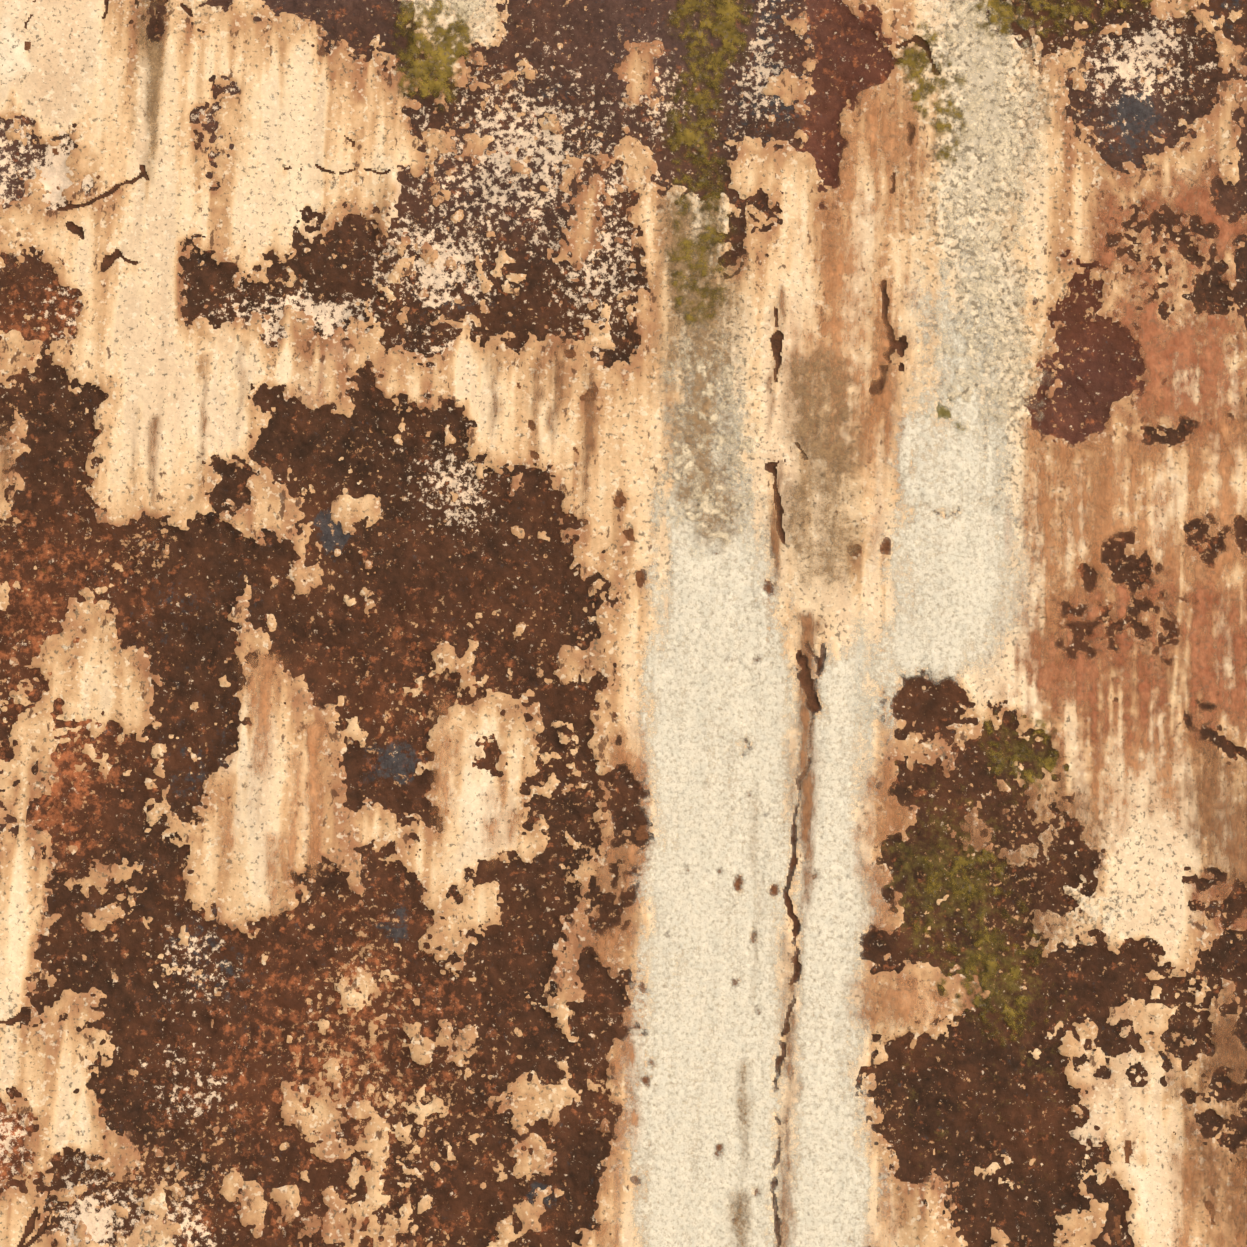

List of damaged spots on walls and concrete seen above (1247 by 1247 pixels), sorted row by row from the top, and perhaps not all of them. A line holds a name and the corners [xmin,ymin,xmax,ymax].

rust [0,115,100,210]
crack [56,164,150,211]
rust [129,0,167,43]
rust [178,0,926,491]
rust [985,0,1247,174]
rust [763,508,780,597]
rust [0,244,656,1247]
rust [717,867,744,892]
crack [770,637,827,1247]
rust [800,692,820,901]
rust [855,107,1247,1247]
peeling [0,1194,52,1247]